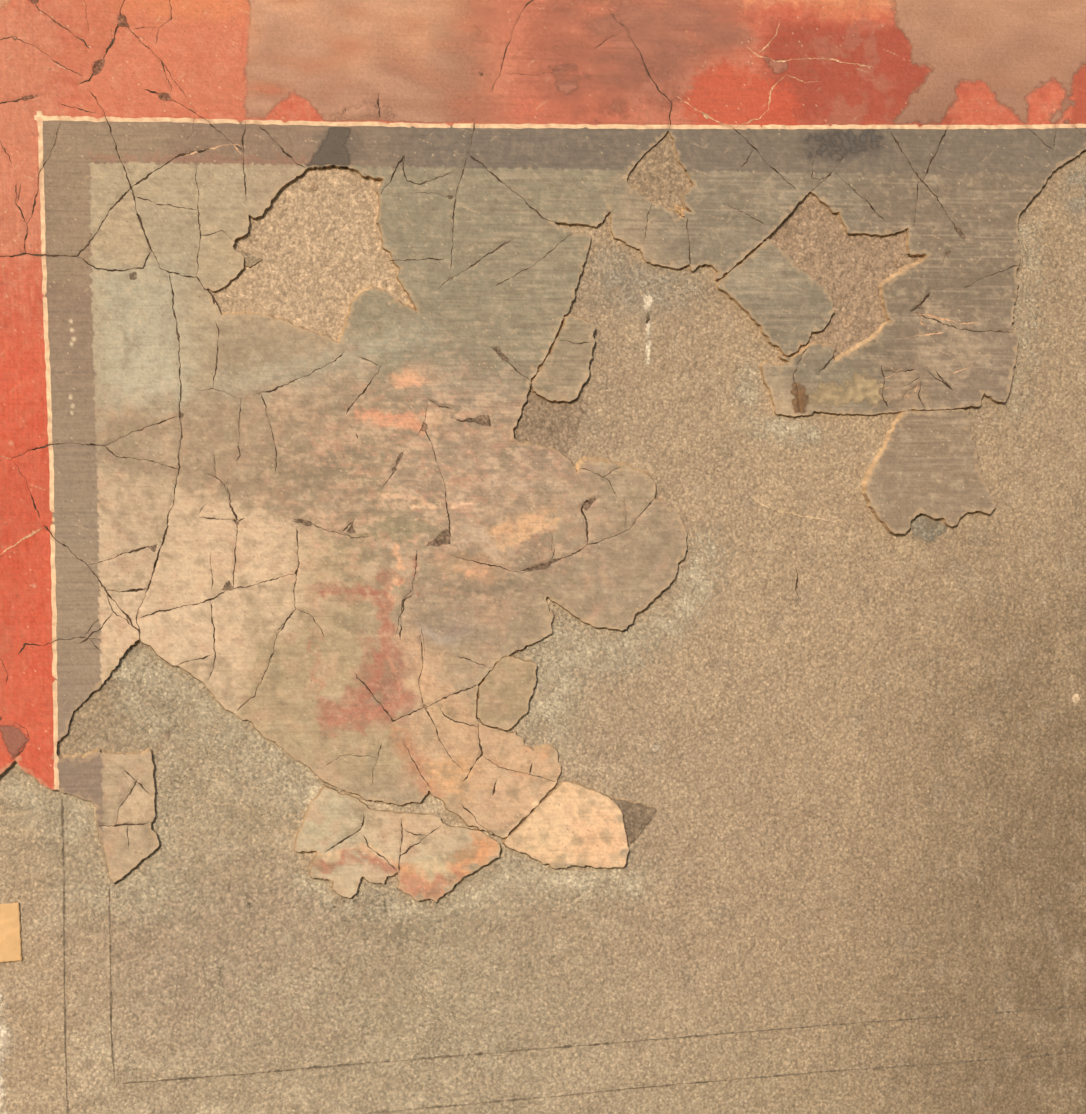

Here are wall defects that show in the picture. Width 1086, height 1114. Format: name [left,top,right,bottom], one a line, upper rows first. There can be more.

crack [0,0,381,711]
spalling [208,164,414,341]
crack [381,123,570,291]
spalling [513,385,589,457]
spalling [627,132,692,217]
crack [596,8,885,221]
spalling [765,193,924,358]
spalling [57,640,214,756]
crack [324,400,655,835]
crack [102,770,150,846]
crack [327,813,438,870]
leakage [0,1022,8,1114]